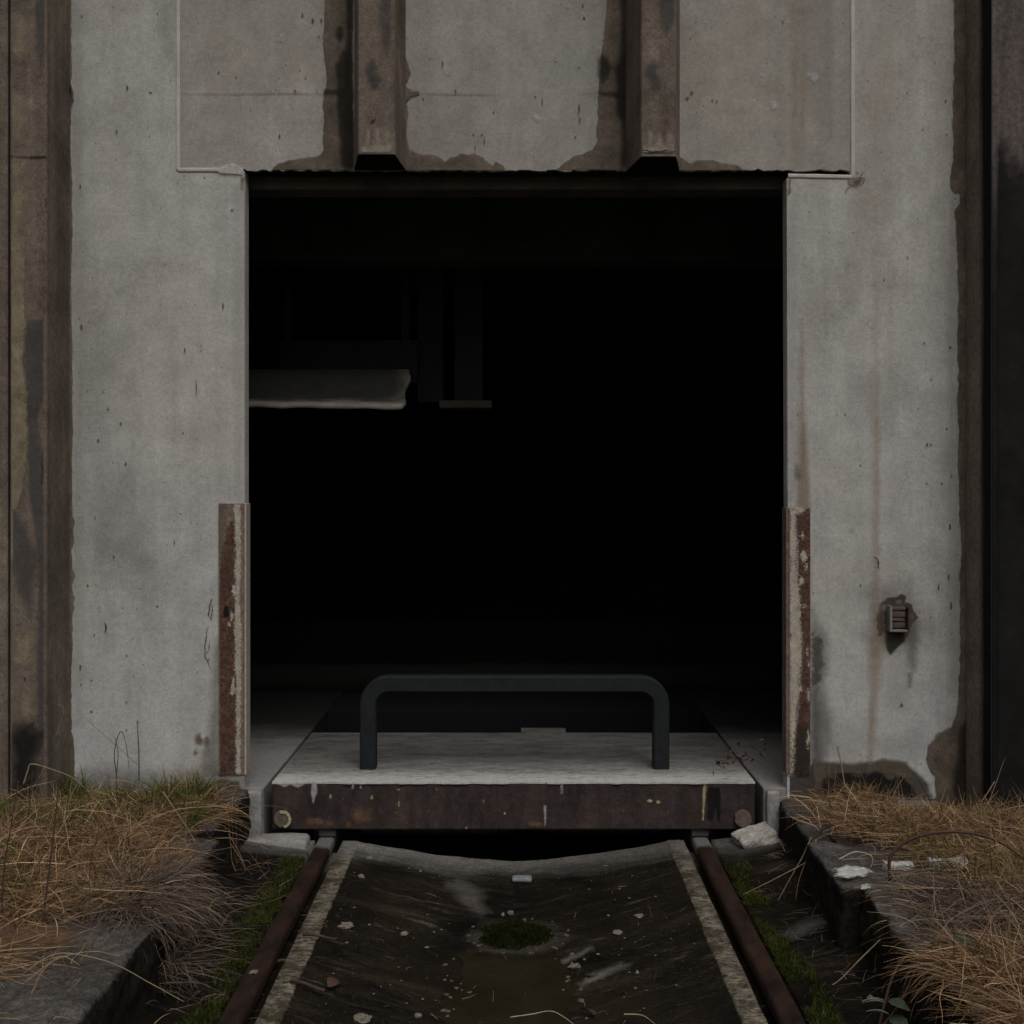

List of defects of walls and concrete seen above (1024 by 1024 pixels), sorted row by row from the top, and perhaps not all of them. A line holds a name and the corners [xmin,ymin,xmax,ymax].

damp [273,0,392,169]
damp [405,60,506,170]
damp [556,0,626,170]
damp [643,132,743,170]
damp [790,0,966,809]
damp [12,321,44,804]
crack [204,599,213,667]
rust [194,520,238,776]
rust [792,509,810,775]